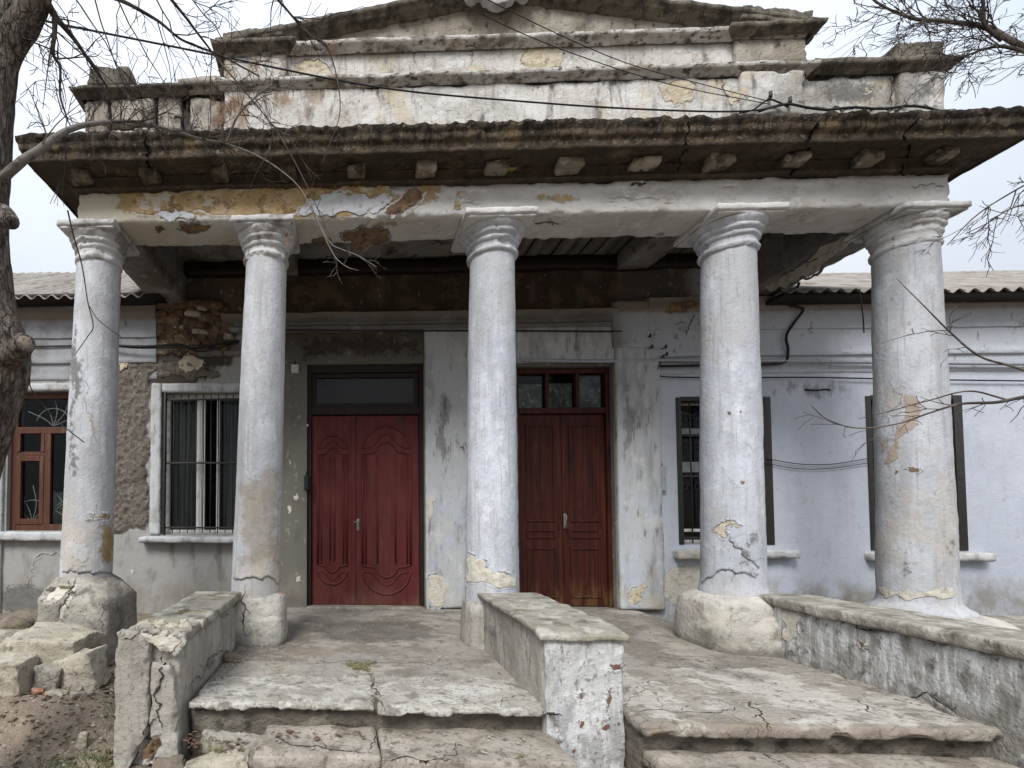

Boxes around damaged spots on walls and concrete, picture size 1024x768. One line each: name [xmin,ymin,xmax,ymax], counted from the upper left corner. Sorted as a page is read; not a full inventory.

spalling [517,47,565,69]
spalling [660,78,697,108]
crack [677,122,690,173]
crack [789,76,945,188]
spalling [129,186,427,254]
spalling [155,299,234,373]
peeling [880,394,925,475]
spalling [44,581,73,606]
crack [206,572,281,633]
spalling [465,550,517,592]
crack [701,536,764,583]
crack [140,650,166,738]